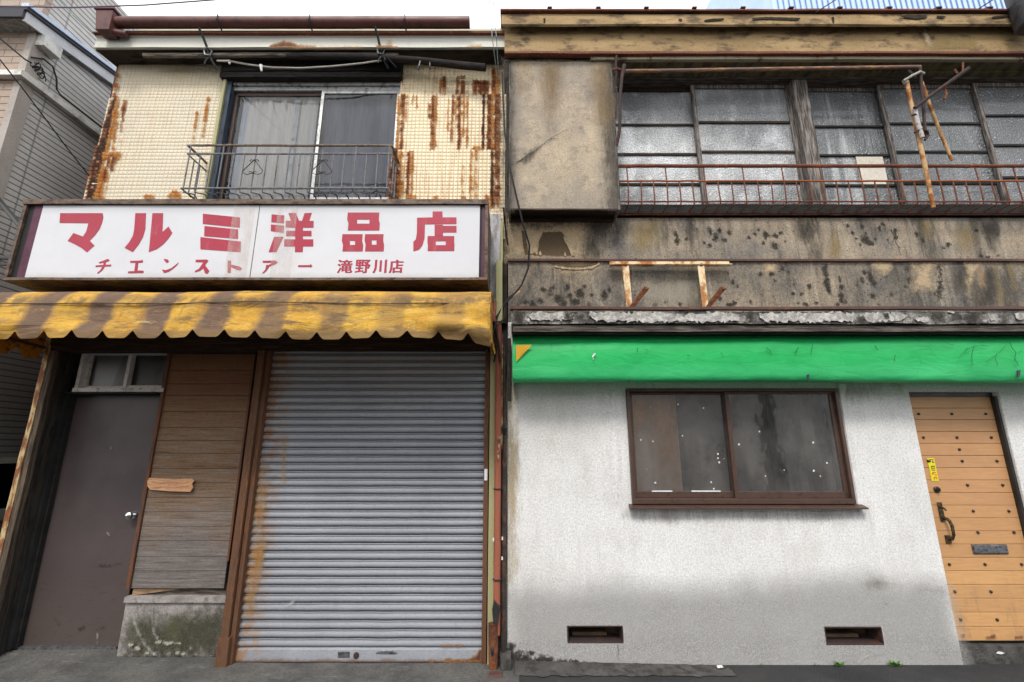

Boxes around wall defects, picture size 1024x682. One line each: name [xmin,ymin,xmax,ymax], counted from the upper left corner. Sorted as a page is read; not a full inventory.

corrosion [82,66,127,199]
corrosion [386,67,501,209]
flaking render [522,230,600,273]
mould [703,227,732,247]
mould [747,229,786,249]
mould [846,223,898,246]
leakage [759,240,893,319]
peeling [589,311,930,323]